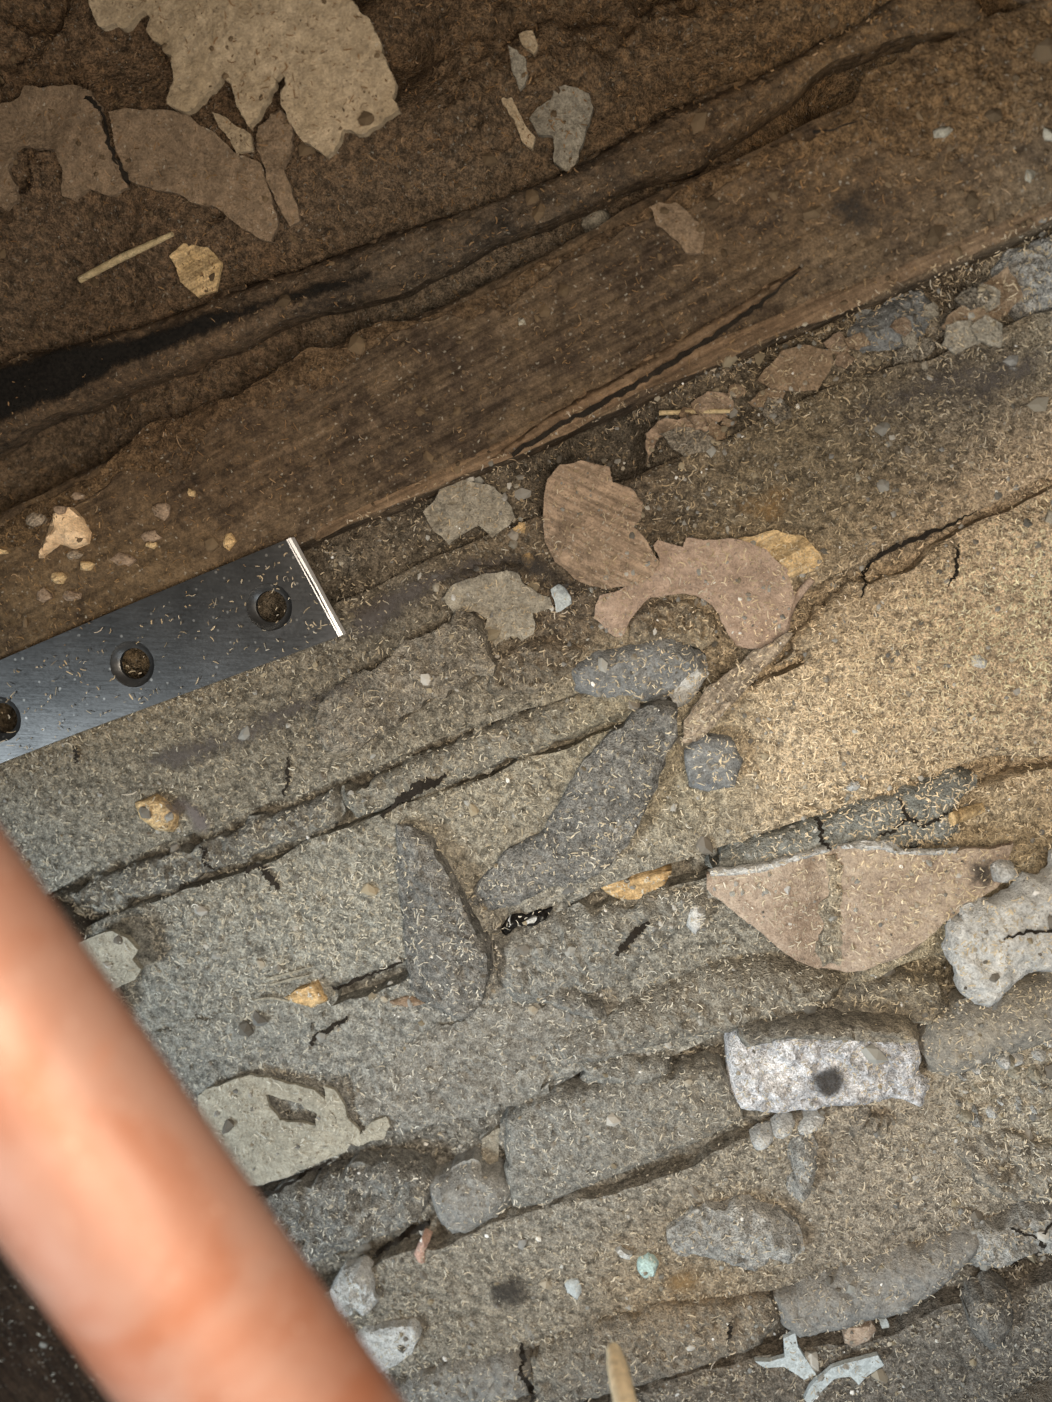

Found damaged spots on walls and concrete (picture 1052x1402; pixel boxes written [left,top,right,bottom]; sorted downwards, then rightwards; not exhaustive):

flaking render [423,480,515,545]
crack [860,510,977,598]
flaking render [443,570,572,649]
crack [380,773,447,819]
crack [876,797,948,836]
crack [615,922,650,956]
crack [1004,929,1052,940]
crack [309,962,403,1046]
flaking render [198,1073,391,1185]
peeling [615,1246,659,1278]
flaking render [357,1318,422,1371]
peeling [754,1318,889,1402]